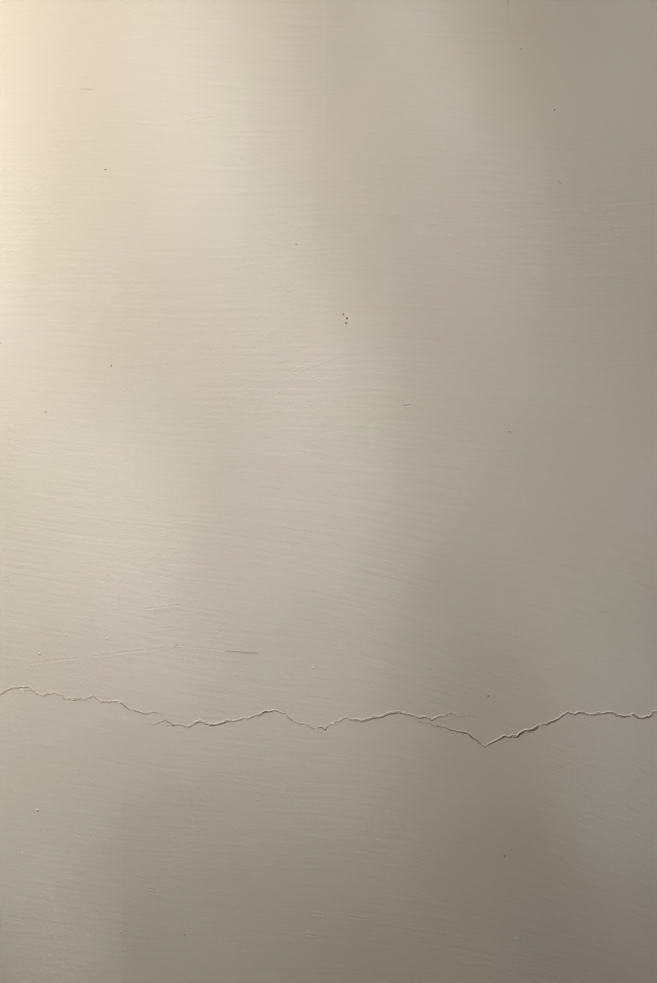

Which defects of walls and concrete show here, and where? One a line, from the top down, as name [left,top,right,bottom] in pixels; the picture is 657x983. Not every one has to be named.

crack [0,685,657,747]